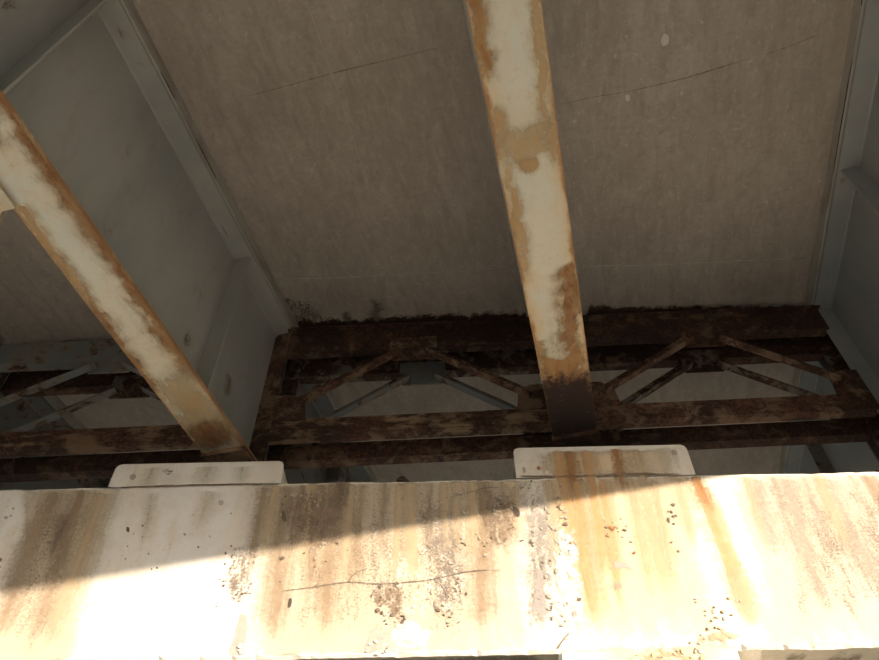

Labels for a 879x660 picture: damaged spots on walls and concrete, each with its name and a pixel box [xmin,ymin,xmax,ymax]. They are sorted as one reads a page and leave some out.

rust [467,0,494,78]
rust [493,0,558,272]
rust [0,97,232,449]
rust [535,263,597,437]
water stain [0,489,117,660]
crack [285,568,497,599]
water stain [250,481,537,660]
rust [543,449,756,660]
water stain [739,474,879,645]